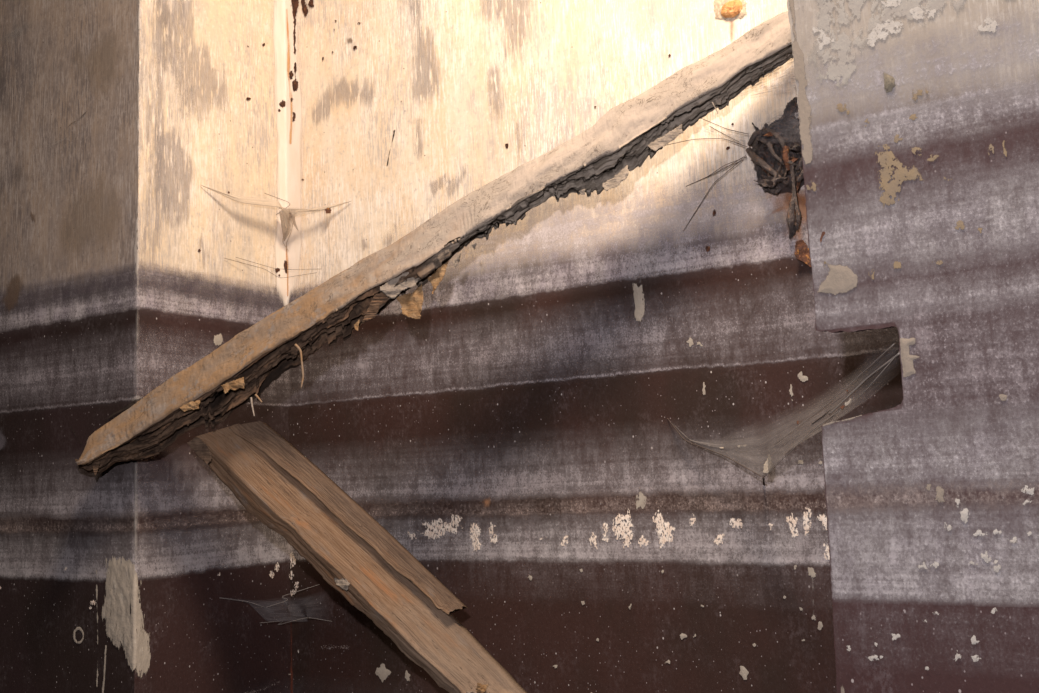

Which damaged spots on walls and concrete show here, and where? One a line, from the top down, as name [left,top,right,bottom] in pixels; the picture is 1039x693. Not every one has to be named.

peeling [809,0,965,87]
spalling [884,73,895,92]
corrosion [757,165,806,219]
peeling [875,134,939,206]
corrosion [794,231,812,268]
leakage [0,340,205,413]
leakage [248,164,1039,603]
leakage [0,480,305,580]
peeling [408,514,498,551]
peeling [589,509,675,549]
peeling [714,518,743,546]
peeling [786,507,827,538]